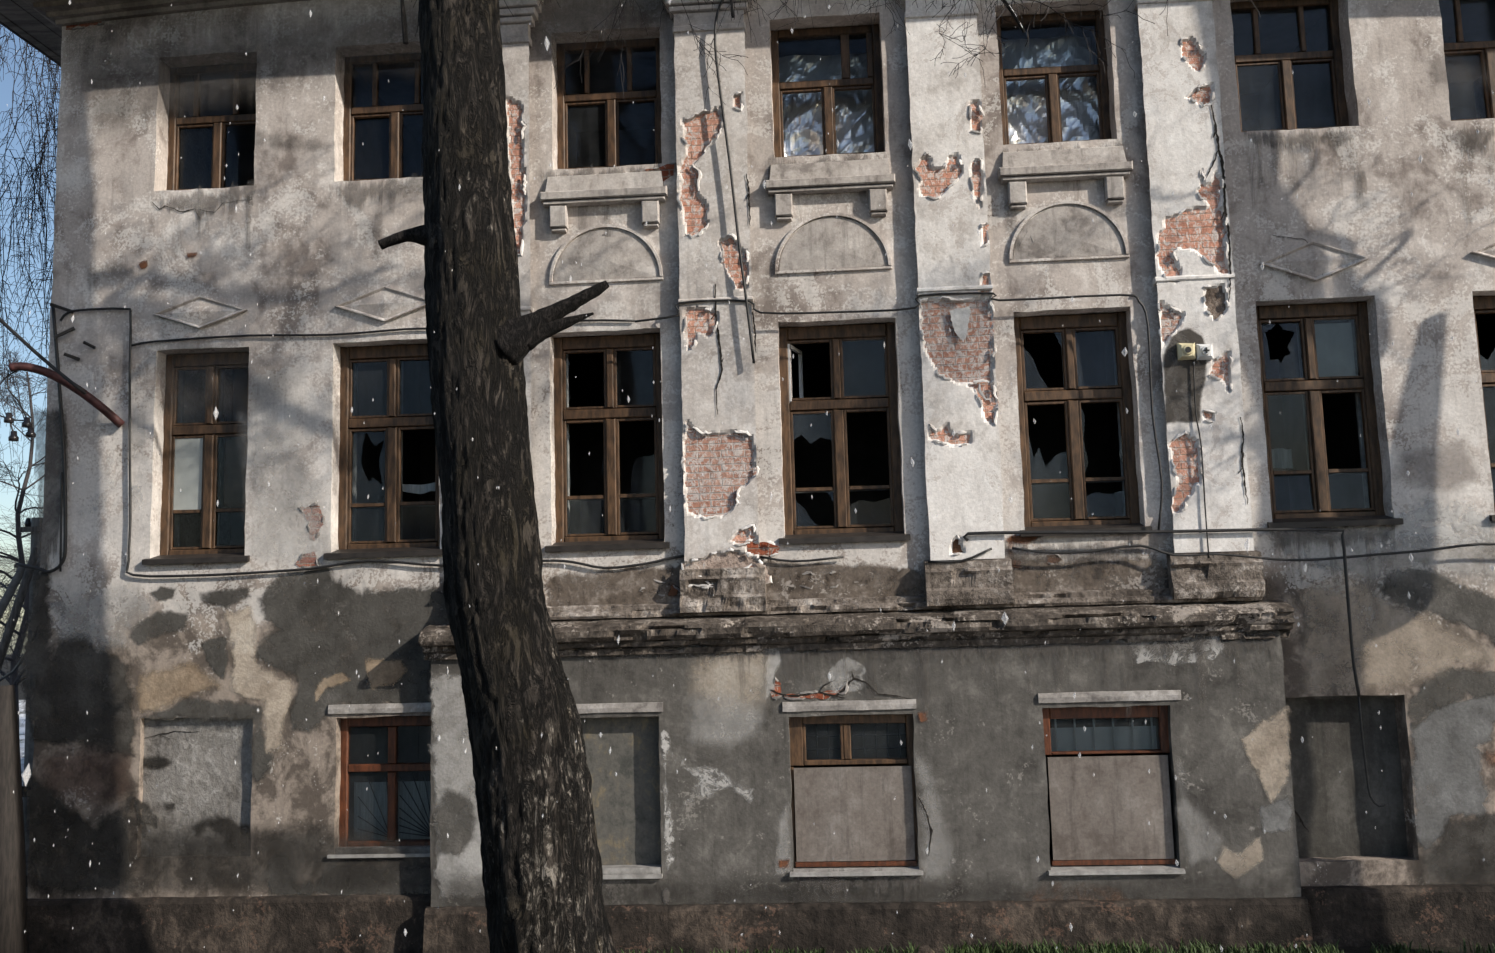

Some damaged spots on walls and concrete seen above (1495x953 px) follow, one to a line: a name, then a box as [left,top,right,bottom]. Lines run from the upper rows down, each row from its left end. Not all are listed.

flaking render [1179,37,1215,107]
flaking render [645,91,744,239]
flaking render [913,152,983,202]
flaking render [1157,169,1230,321]
flaking render [919,271,999,425]
flaking render [1208,353,1234,391]
flaking render [680,424,760,520]
flaking render [1169,431,1203,512]
flaking render [295,502,325,568]
flaking render [640,524,780,597]
flaking render [952,535,963,556]
damp [47,753,475,890]